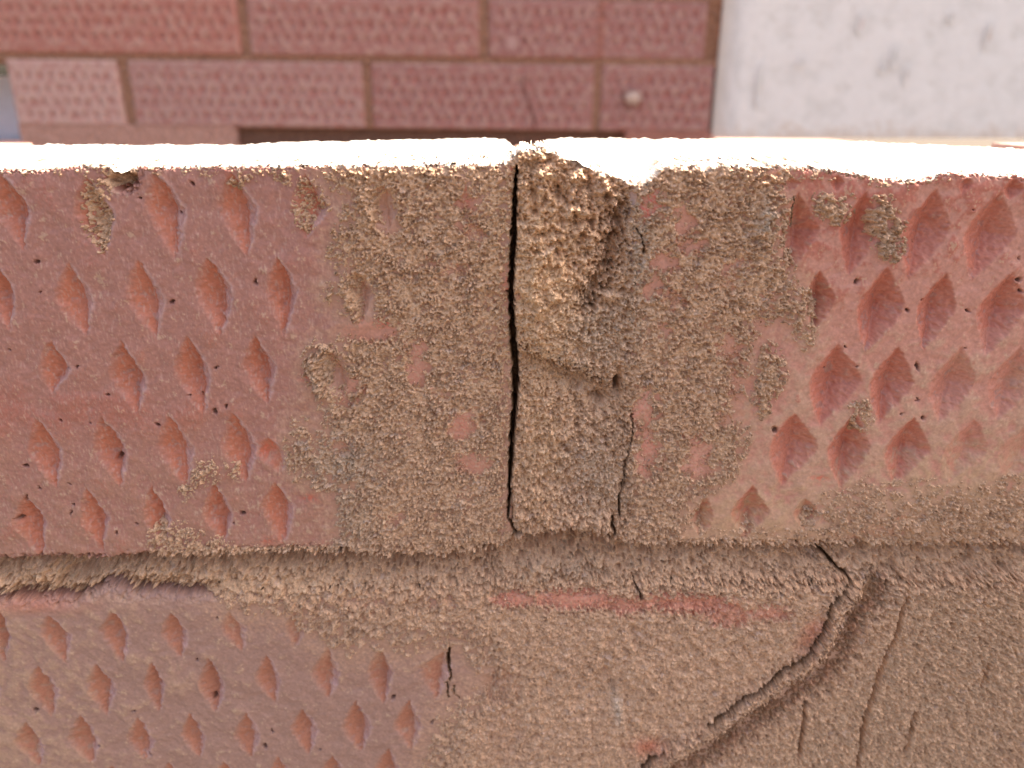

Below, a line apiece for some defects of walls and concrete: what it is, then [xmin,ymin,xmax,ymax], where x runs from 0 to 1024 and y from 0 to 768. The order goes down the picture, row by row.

crack [506,164,521,538]
crack [609,413,634,540]
crack [707,543,855,735]
crack [639,751,667,768]